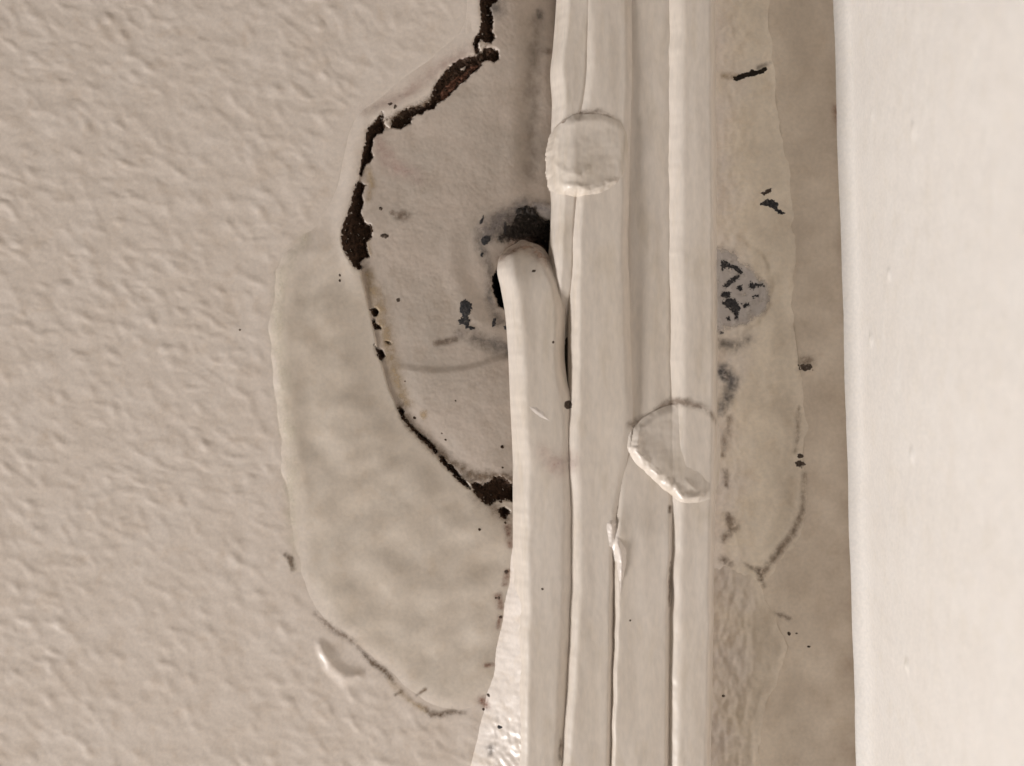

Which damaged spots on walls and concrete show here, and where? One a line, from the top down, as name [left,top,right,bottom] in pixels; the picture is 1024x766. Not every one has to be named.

spalling [358,0,556,490]
leakage [480,206,536,257]
peeling [714,0,812,585]